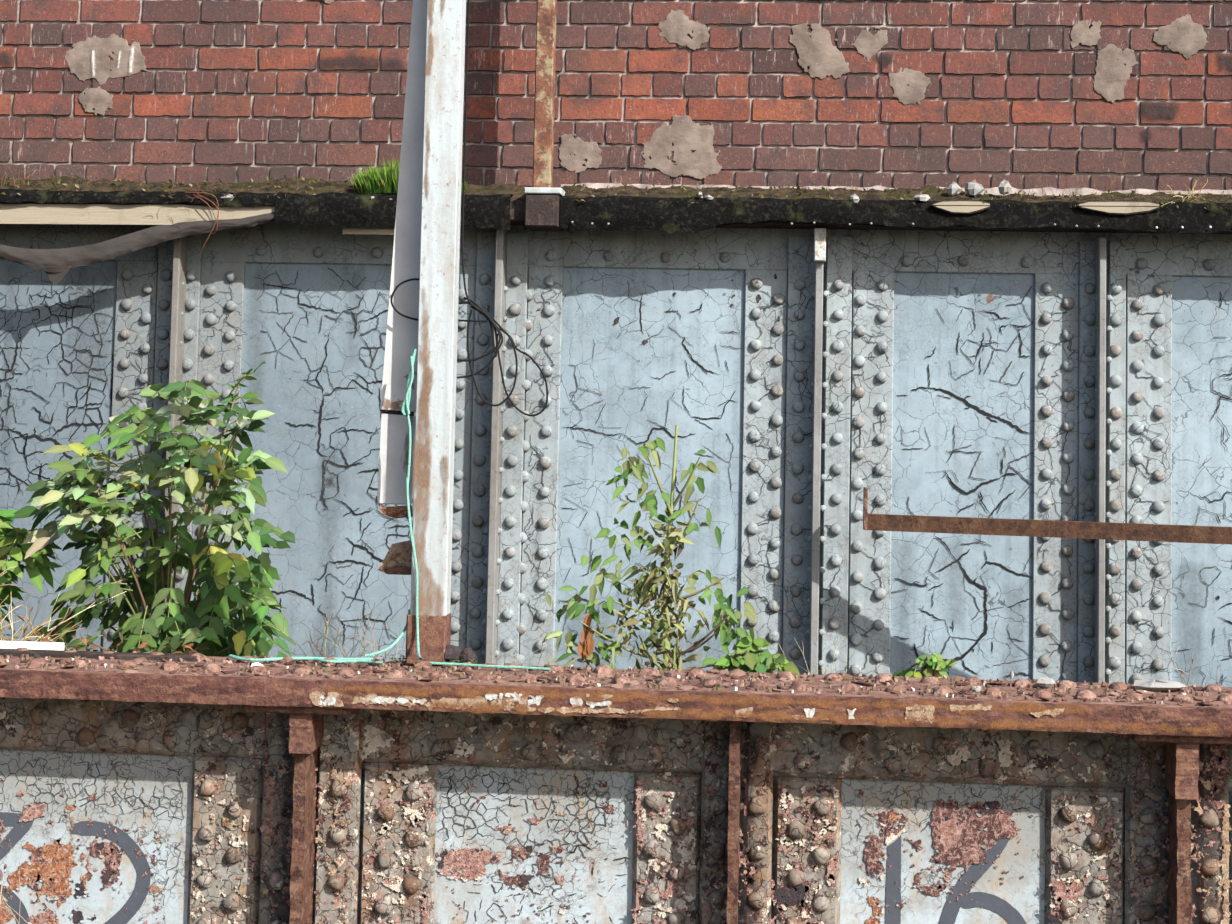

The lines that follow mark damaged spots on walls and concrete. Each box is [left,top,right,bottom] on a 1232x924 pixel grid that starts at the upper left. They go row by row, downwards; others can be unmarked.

rust [425,0,445,74]
crack [0,269,158,494]
crack [524,276,1077,682]
crack [1129,293,1232,686]
crack [0,757,184,921]
peeling [191,723,295,924]
crack [437,767,630,924]
peeling [309,691,843,924]
rust [328,685,1232,924]
peeling [905,704,935,723]
peeling [854,788,1034,924]
peeling [937,738,1169,924]